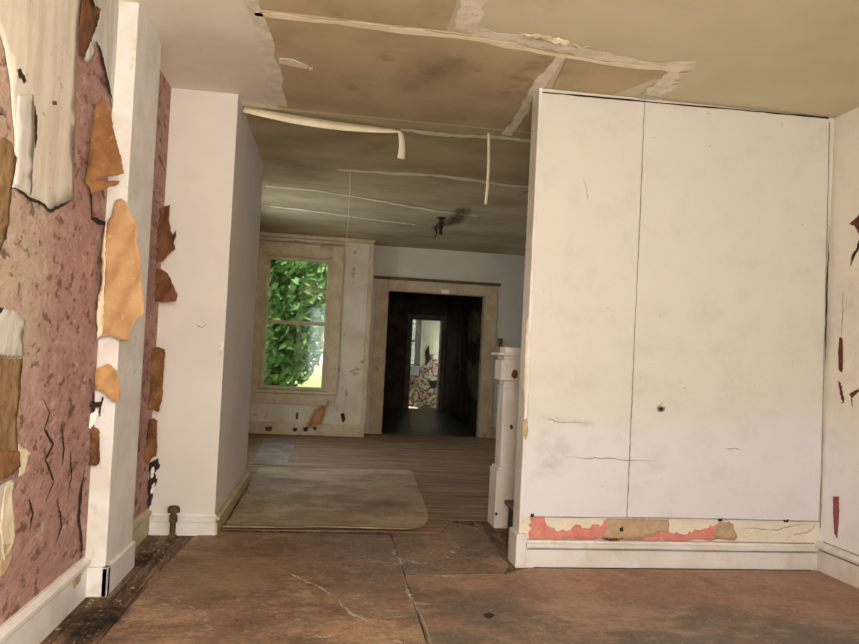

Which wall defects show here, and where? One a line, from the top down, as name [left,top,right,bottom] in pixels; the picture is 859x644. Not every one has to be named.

peeling [519,33,587,49]
peeling [850,214,859,266]
peeling [838,300,859,407]
peeling [89,397,104,429]
peeling [18,444,31,477]
peeling [147,459,160,508]
peeling [528,514,737,542]